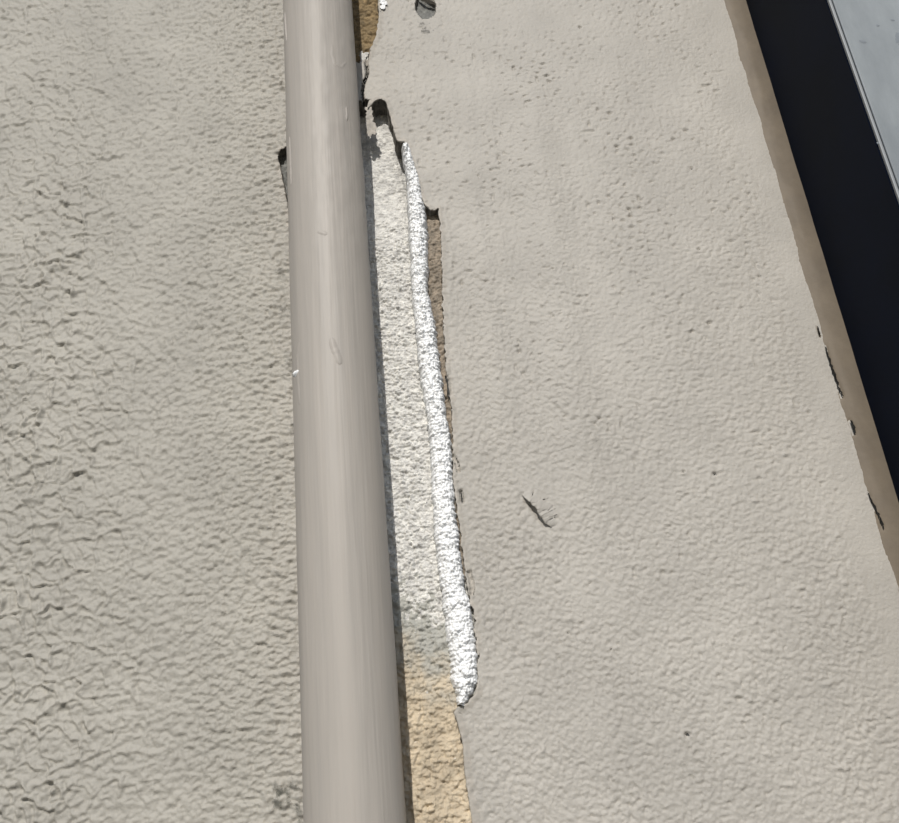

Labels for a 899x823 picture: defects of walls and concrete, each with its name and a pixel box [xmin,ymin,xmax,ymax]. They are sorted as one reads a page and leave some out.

spalling [352,0,387,66]
peeling [416,0,435,19]
spalling [273,143,288,226]
spalling [360,96,484,823]